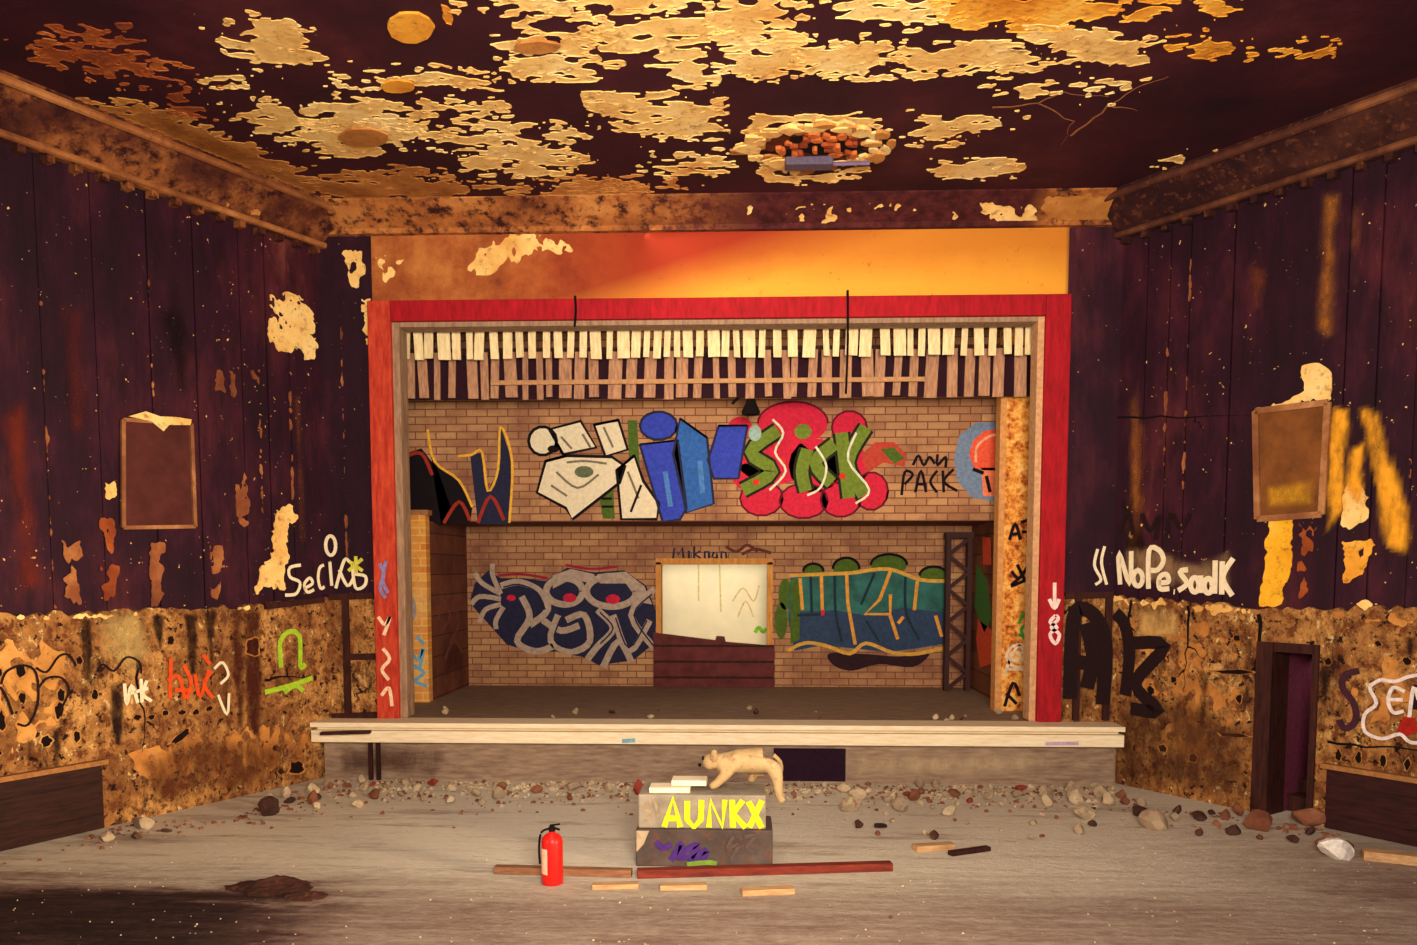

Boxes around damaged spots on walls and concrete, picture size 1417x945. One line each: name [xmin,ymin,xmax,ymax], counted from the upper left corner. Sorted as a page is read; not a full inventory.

peeling [25,0,1343,199]
peeling [267,292,318,360]
peeling [342,250,403,345]
peeling [467,234,573,276]
peeling [235,420,298,610]
peeling [1340,485,1377,583]
flaking render [0,639,84,756]
flaking render [128,705,312,779]
flaking render [1114,520,1314,763]
spalling [1335,748,1362,764]
flaking render [1331,599,1414,627]
flaking render [1369,640,1414,727]